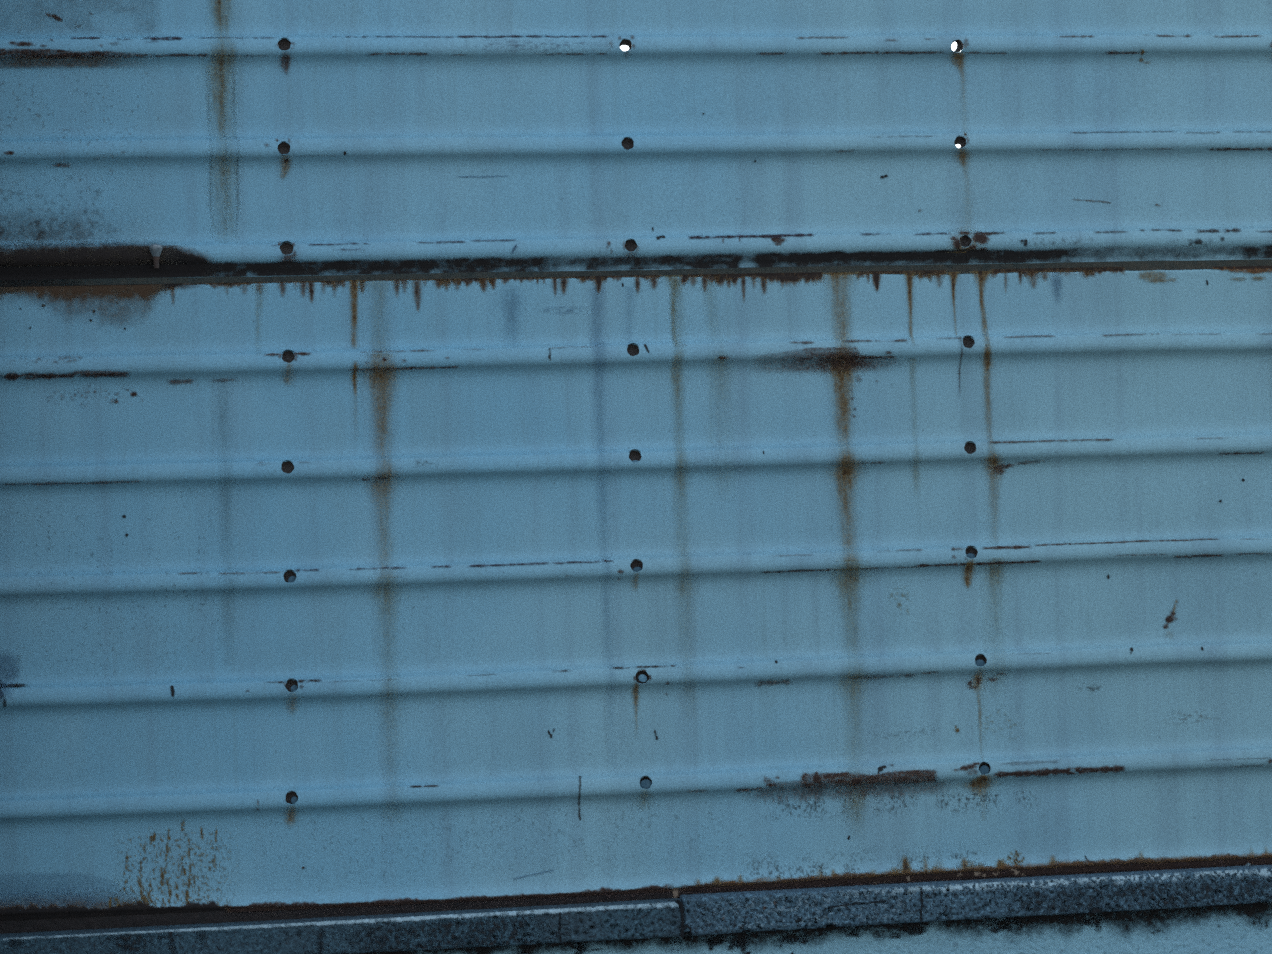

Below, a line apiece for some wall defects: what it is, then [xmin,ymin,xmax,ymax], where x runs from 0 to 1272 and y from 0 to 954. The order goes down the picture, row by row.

corrosion [951,231,990,253]
corrosion [1213,266,1272,279]
corrosion [973,267,1124,328]
corrosion [0,243,958,434]
corrosion [988,455,1032,474]
corrosion [837,453,854,523]
corrosion [764,770,936,803]
corrosion [954,762,990,792]
corrosion [0,821,1272,921]